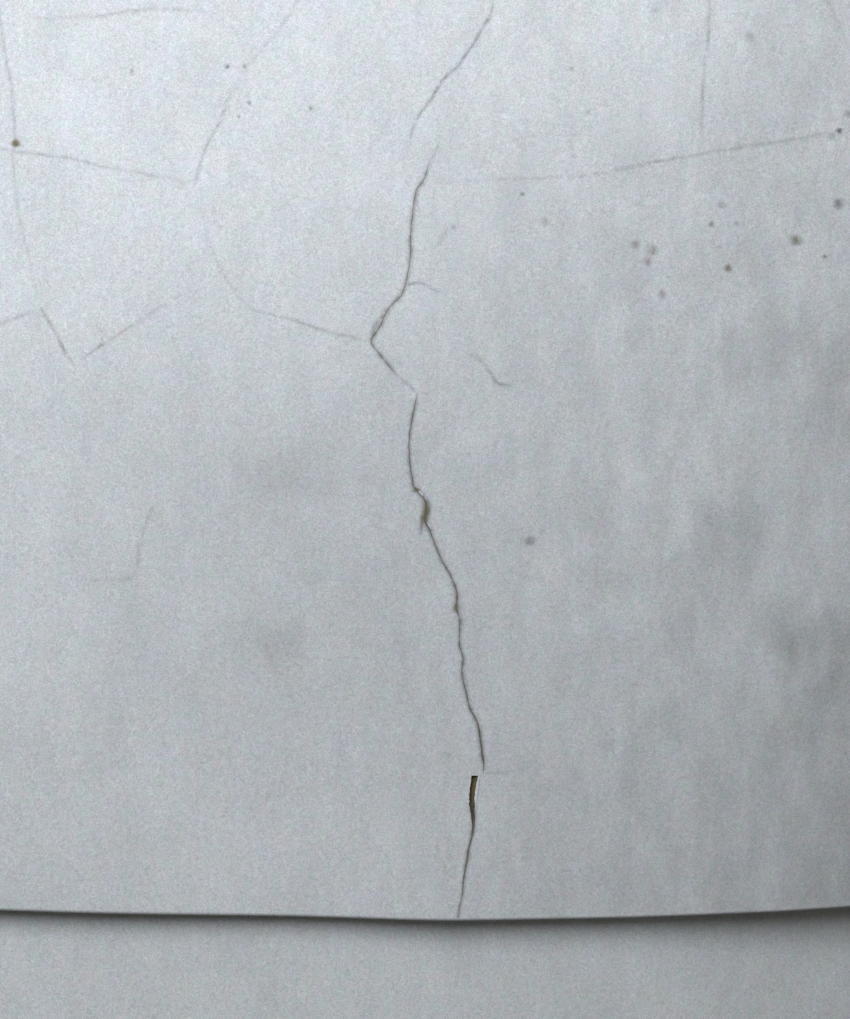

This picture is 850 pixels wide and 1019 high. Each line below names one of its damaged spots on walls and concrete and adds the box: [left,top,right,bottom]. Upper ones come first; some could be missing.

crack [371,162,430,370]
crack [408,392,485,910]